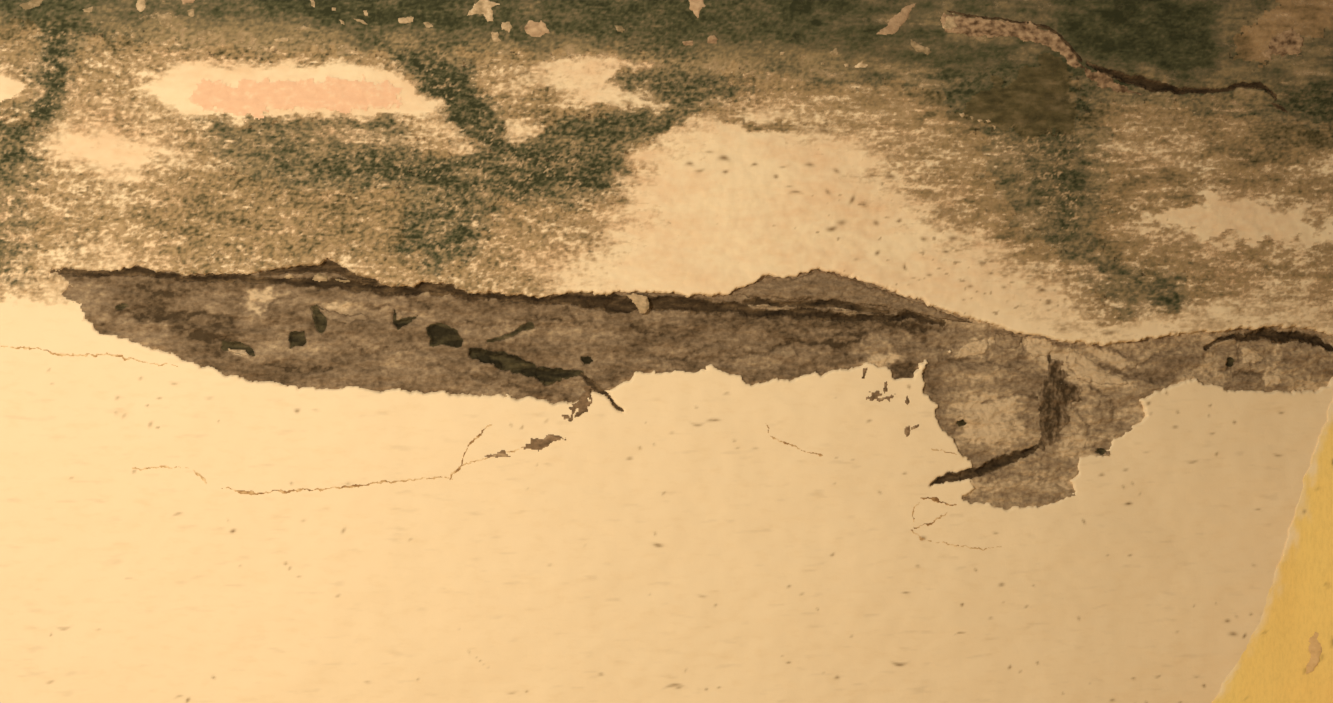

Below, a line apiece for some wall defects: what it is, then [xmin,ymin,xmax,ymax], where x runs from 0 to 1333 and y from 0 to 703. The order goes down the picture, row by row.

leakage [0,0,1333,327]
crack [1087,61,1287,113]
flaking render [58,258,1333,510]
crack [1204,329,1333,352]